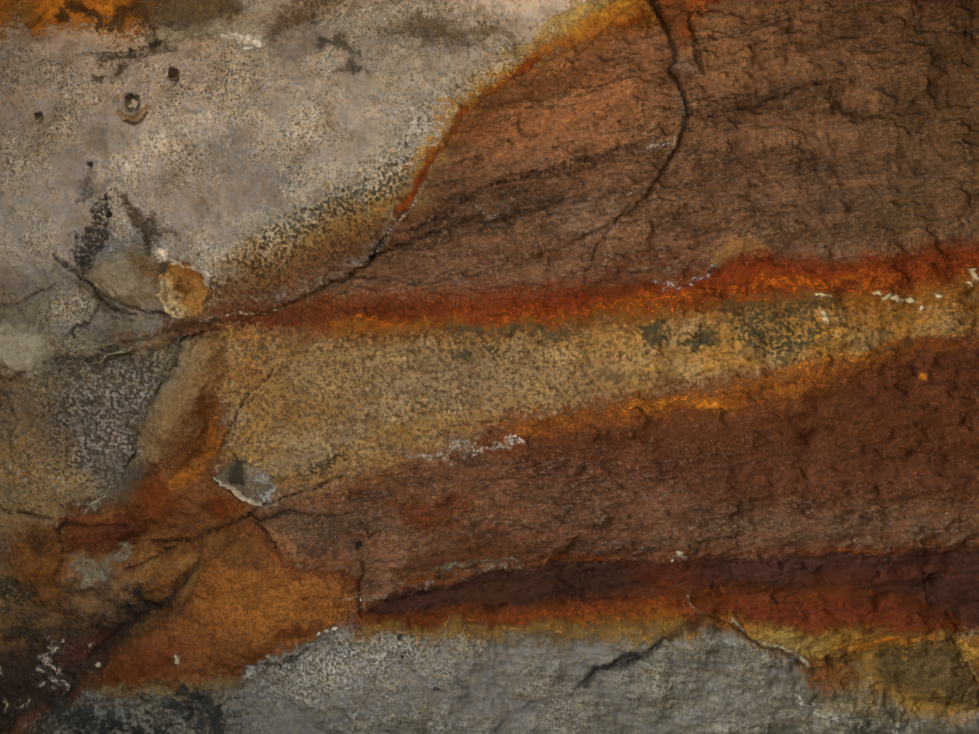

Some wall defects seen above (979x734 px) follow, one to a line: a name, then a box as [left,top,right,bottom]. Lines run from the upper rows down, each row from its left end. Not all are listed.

corrosion [0,0,159,39]
corrosion [160,0,979,339]
corrosion [476,334,979,476]
crack [4,510,128,562]
crack [92,476,341,655]
spalling [213,453,276,507]
corrosion [0,387,979,734]
crack [582,619,799,688]